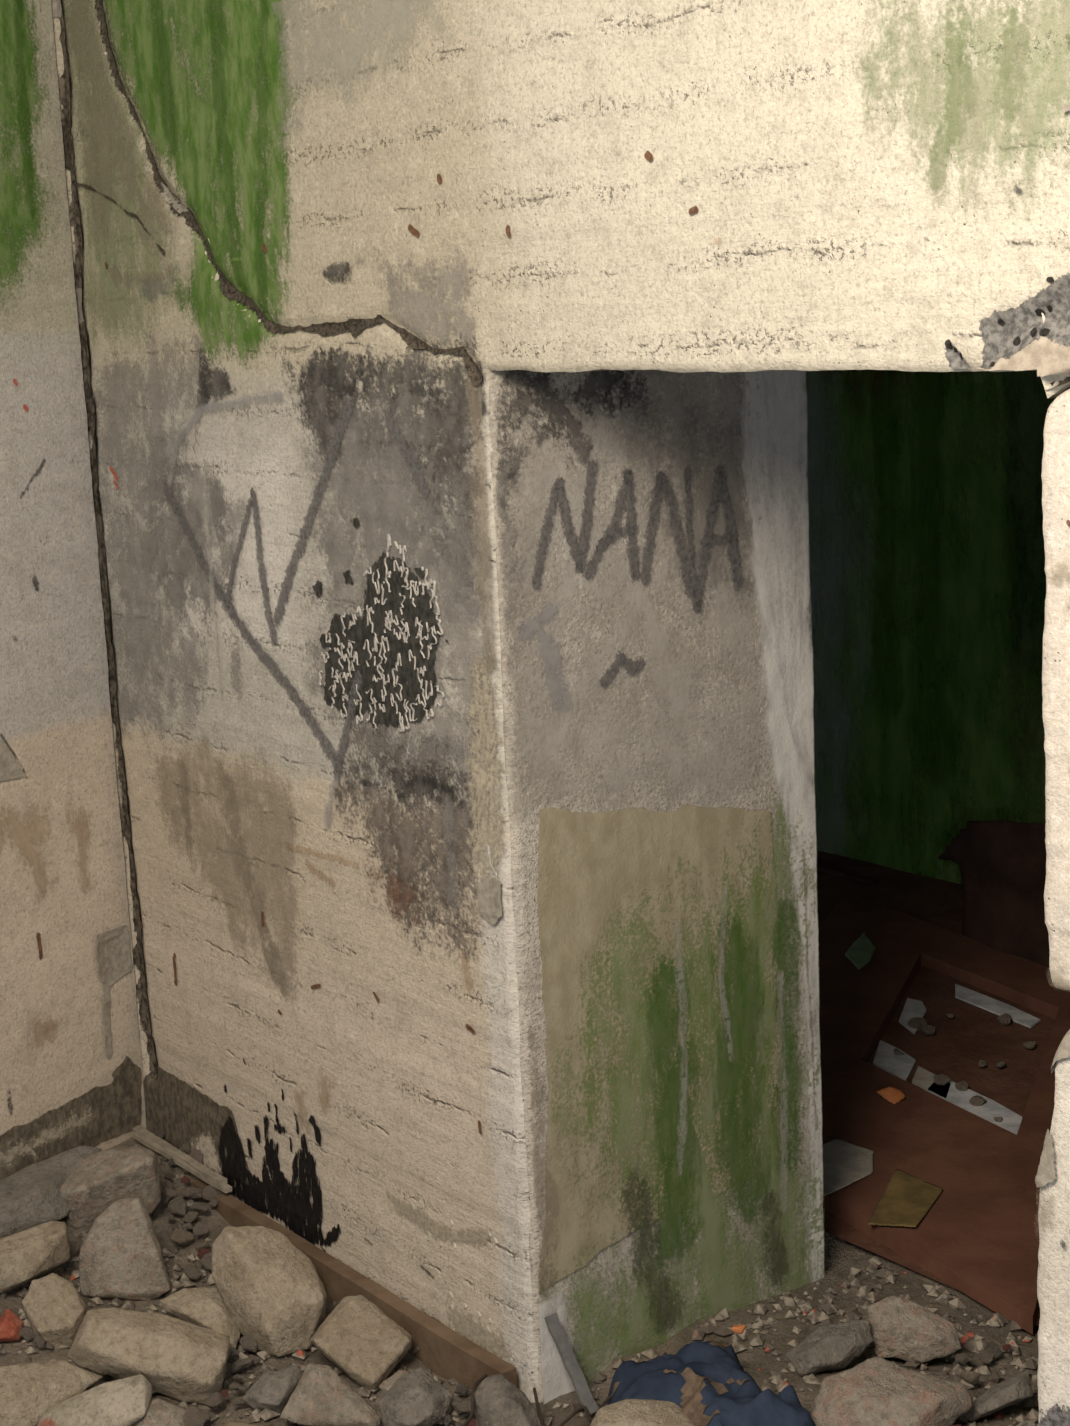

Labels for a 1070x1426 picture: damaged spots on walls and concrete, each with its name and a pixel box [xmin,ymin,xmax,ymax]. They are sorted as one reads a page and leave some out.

crack [51,0,482,1078]
water stain [804,373,849,852]
water stain [872,370,897,541]
water stain [913,372,946,786]
spalling [945,271,1070,377]
water stain [623,1173,681,1333]